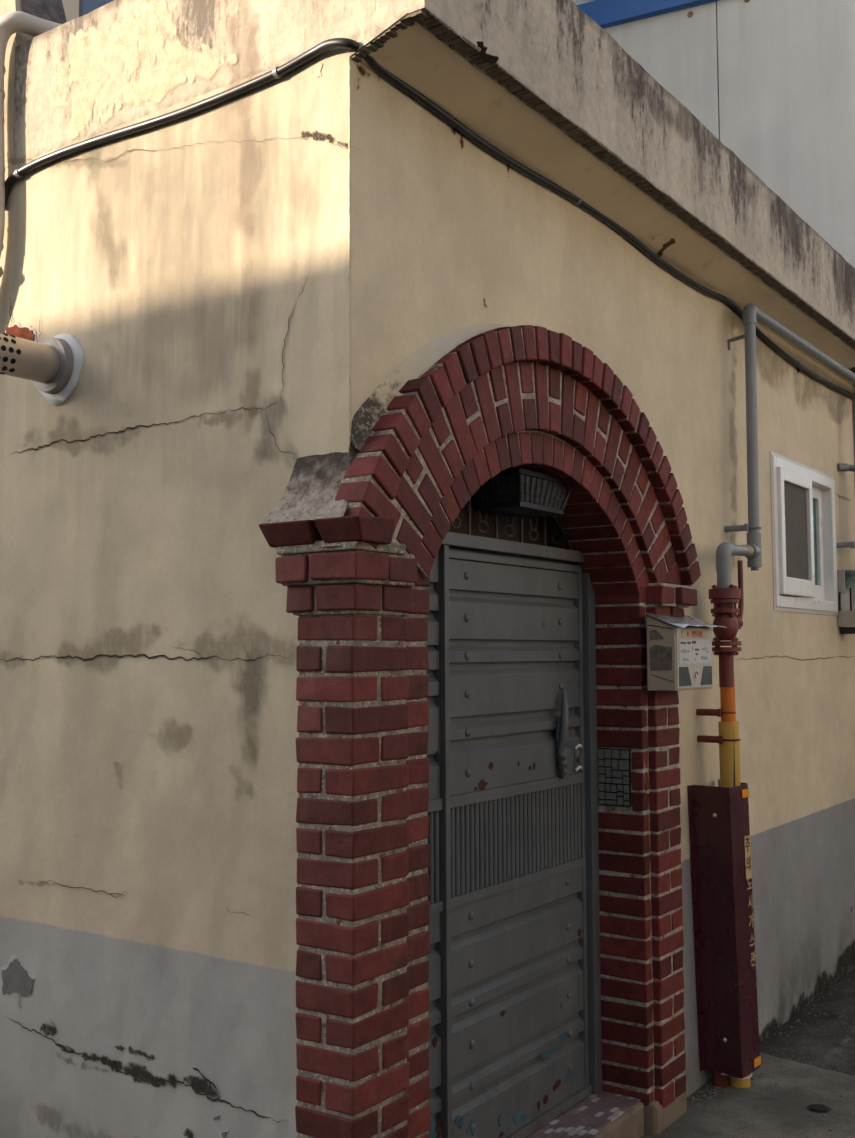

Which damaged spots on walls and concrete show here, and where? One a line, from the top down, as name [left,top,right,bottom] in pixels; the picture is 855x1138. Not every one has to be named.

peeling [50,0,237,139]
crack [10,271,310,456]
crack [0,646,290,713]
peeling [1,954,36,997]
water stain [759,940,855,1043]
crack [13,1020,285,1123]